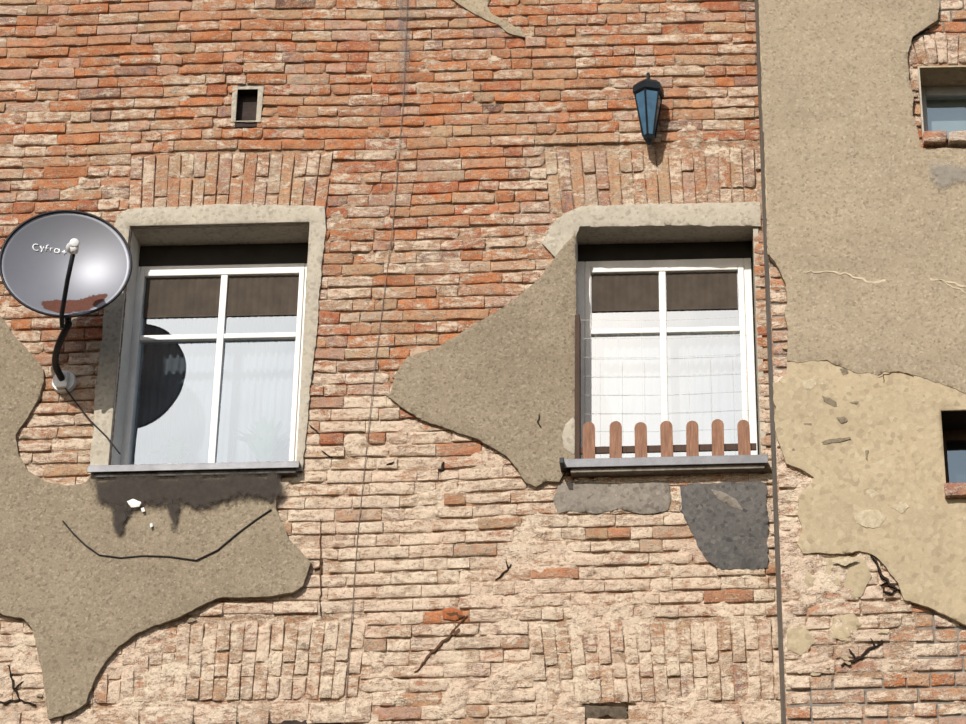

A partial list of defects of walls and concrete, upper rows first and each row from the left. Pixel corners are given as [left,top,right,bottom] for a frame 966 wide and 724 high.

spalling [908,0,966,148]
crack [804,270,886,284]
crack [930,278,966,293]
flaking render [386,233,577,488]
spalling [803,379,848,424]
flaking render [0,316,312,720]
spalling [776,436,966,724]
crack [414,612,468,673]
spalling [442,608,464,621]